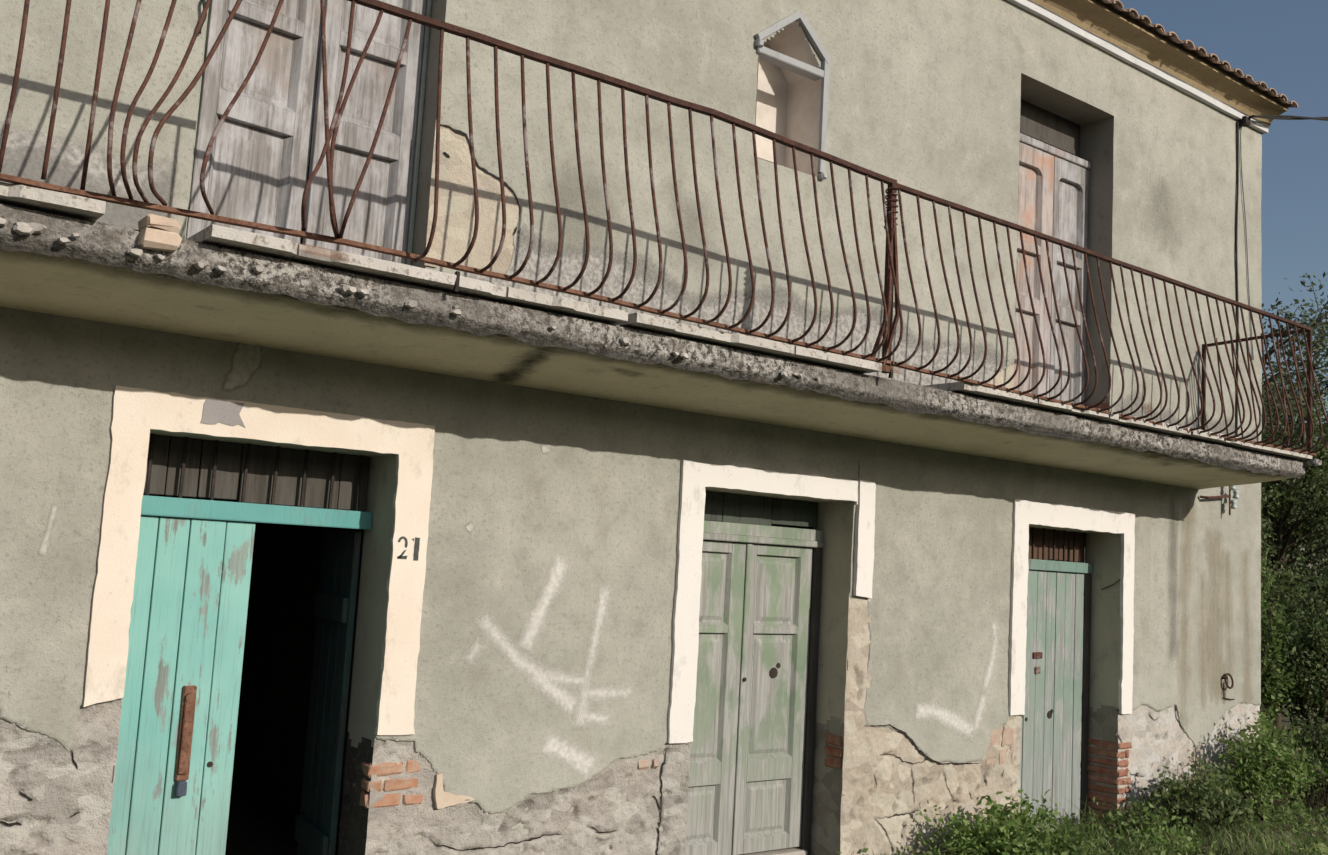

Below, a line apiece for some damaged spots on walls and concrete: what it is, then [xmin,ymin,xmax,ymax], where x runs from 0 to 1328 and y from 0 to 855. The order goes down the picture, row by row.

flaking render [425,125,521,274]
spalling [0,204,1305,478]
flaking render [0,698,123,855]
flaking render [359,738,691,855]
flaking render [824,593,1022,855]
flaking render [1086,703,1260,830]